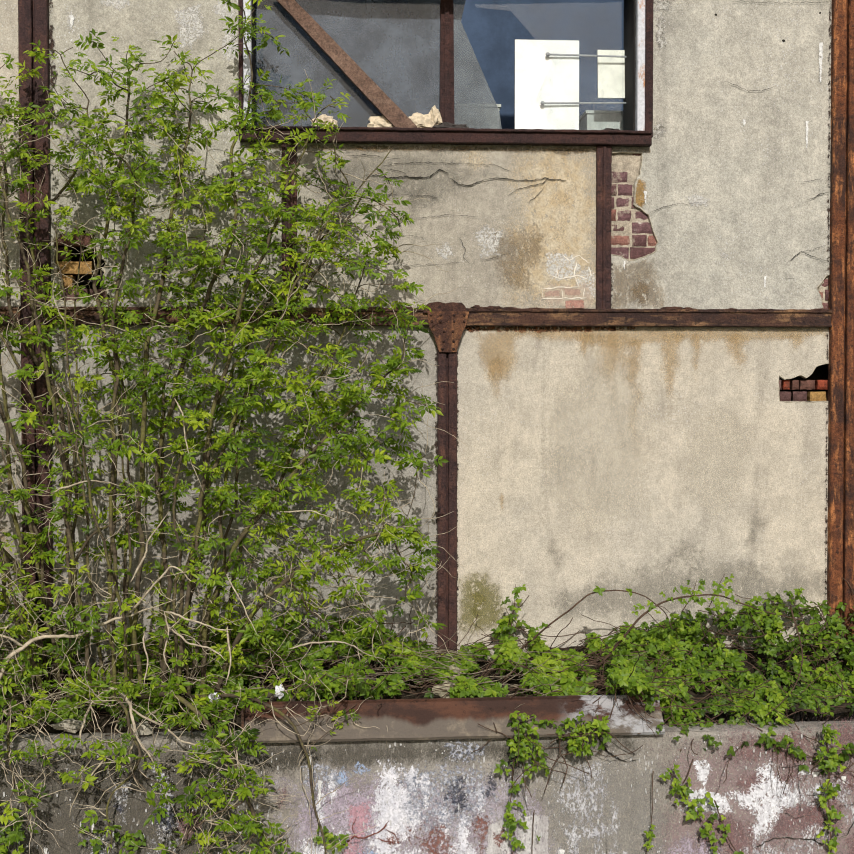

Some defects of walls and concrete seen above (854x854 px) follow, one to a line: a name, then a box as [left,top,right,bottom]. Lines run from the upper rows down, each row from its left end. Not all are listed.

crack [321,148,566,238]
water stain [475,224,503,258]
water stain [510,149,596,301]
spalling [611,151,658,262]
spalling [778,363,829,403]
peeling [287,739,508,854]
peeling [554,762,612,842]
peeling [661,721,854,854]